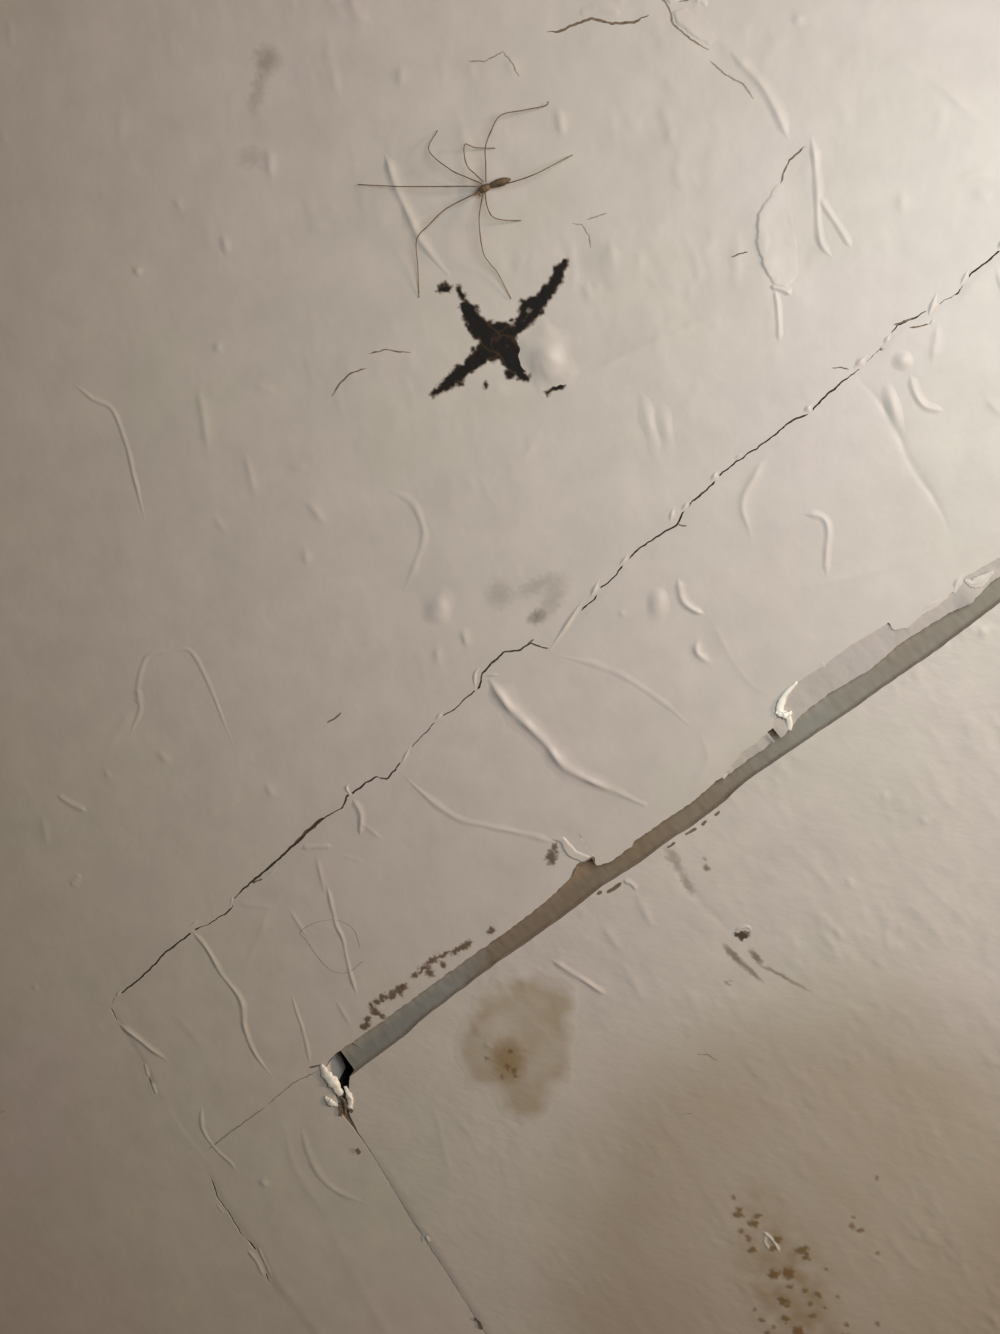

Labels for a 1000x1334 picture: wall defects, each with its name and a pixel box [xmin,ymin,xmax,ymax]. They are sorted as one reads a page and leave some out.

crack [781,146,805,182]
crack [573,213,606,246]
crack [112,241,1000,1096]
flaking render [722,558,1000,779]
flaking render [597,877,639,895]
crack [342,1112,373,1155]
water stain [453,938,1000,1334]
crack [212,1181,273,1280]